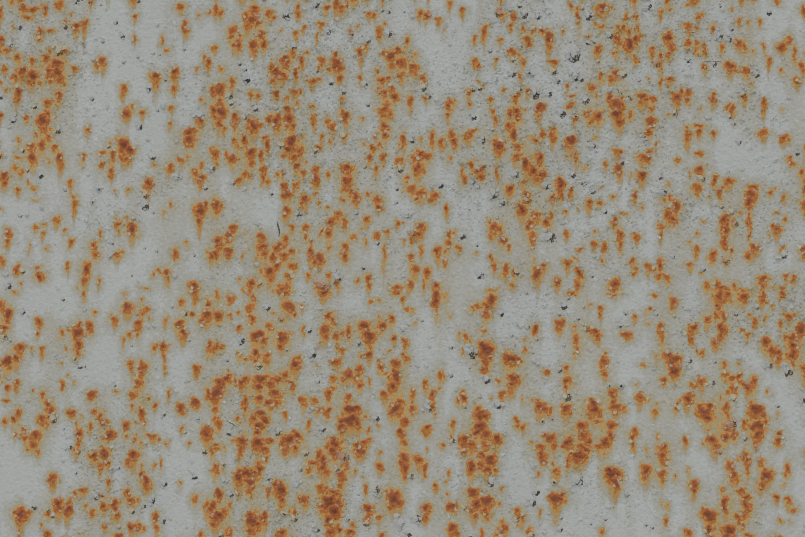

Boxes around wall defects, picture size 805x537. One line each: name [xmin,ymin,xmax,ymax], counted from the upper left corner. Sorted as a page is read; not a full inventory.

rust [459,0,805,315]
rust [673,97,805,388]